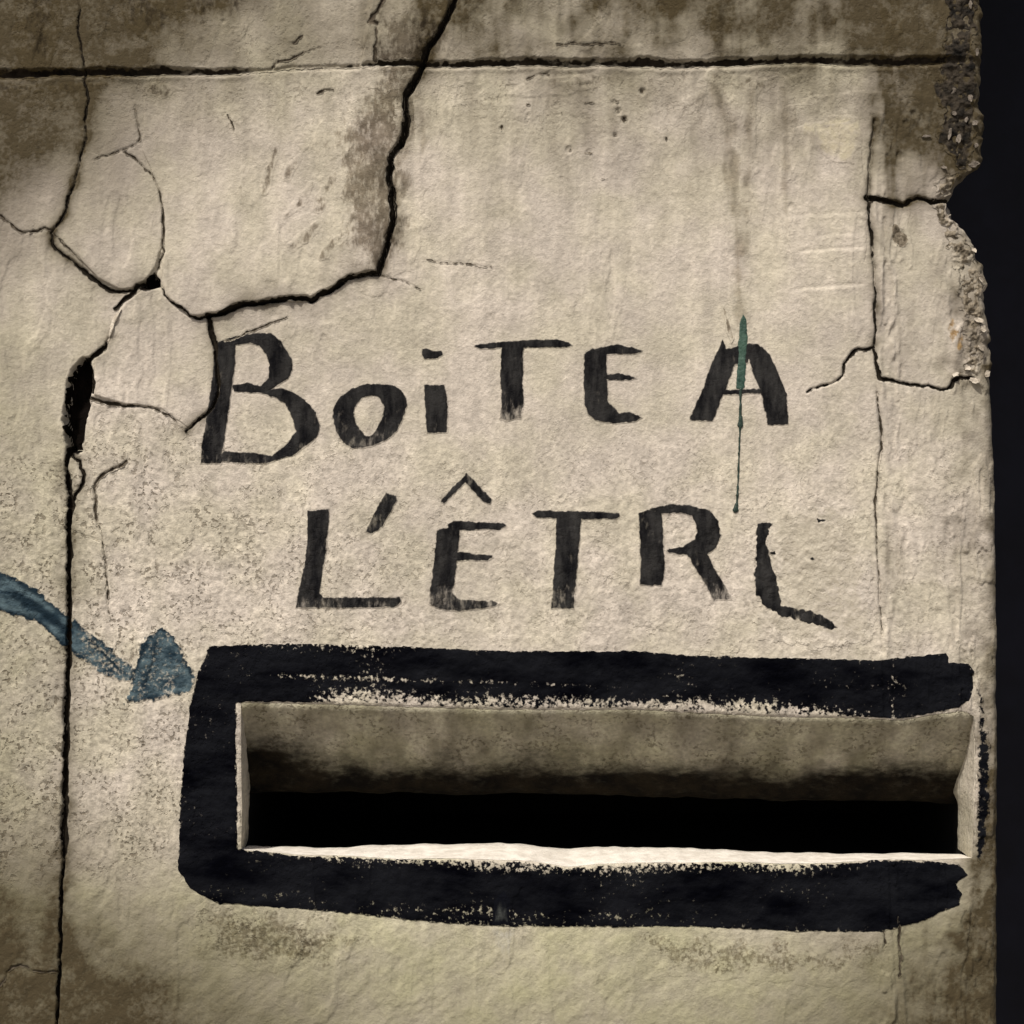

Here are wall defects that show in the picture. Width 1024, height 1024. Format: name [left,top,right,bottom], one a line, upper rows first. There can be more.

crack [0,0,457,433]
water stain [260,0,462,298]
crack [423,258,492,268]
crack [806,119,975,636]
spalling [922,0,990,384]
crack [0,447,128,1024]
crack [881,921,903,978]